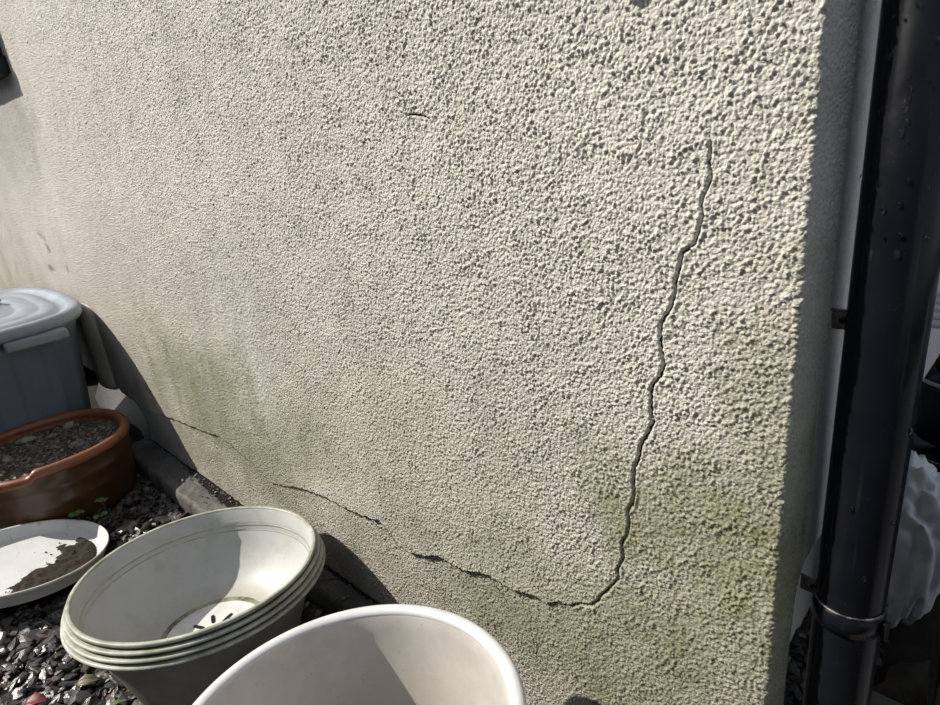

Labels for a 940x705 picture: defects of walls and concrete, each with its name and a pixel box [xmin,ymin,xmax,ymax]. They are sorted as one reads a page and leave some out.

crack [299,144,713,606]